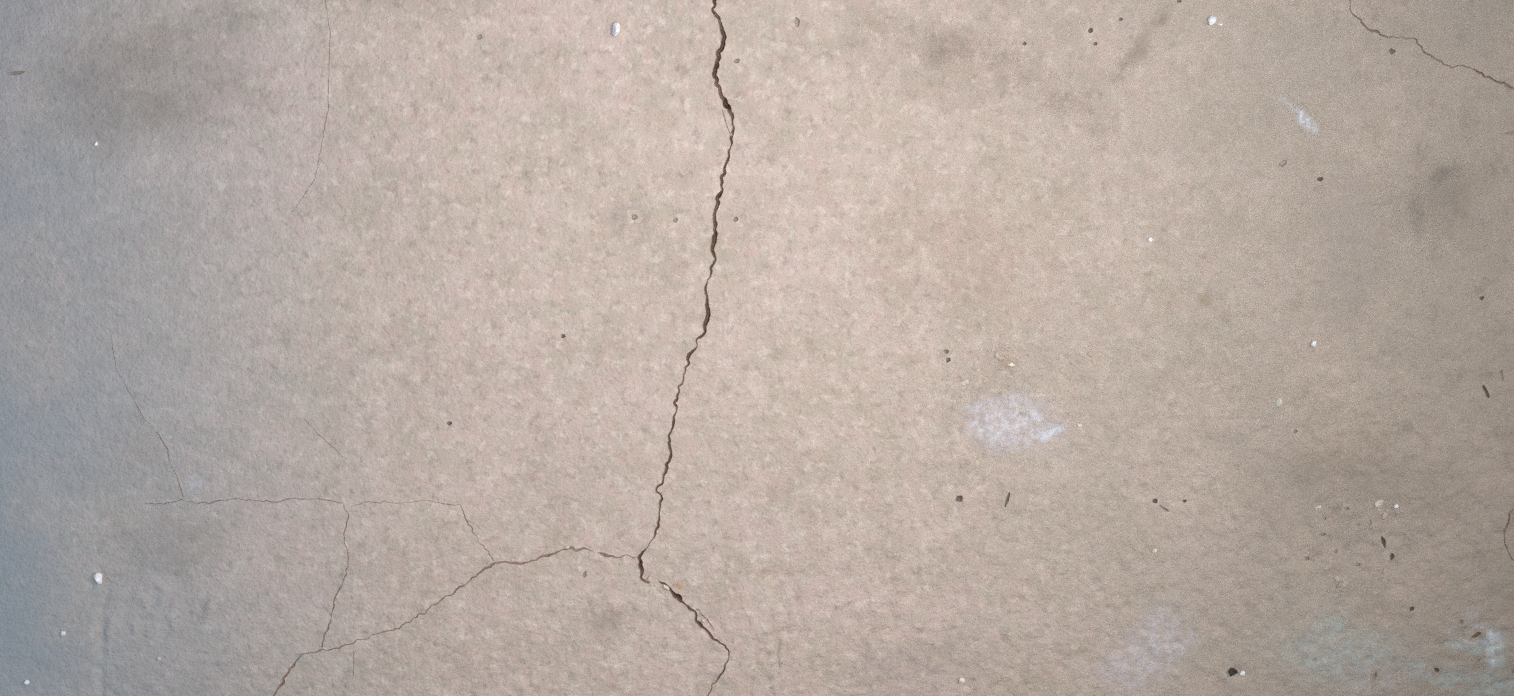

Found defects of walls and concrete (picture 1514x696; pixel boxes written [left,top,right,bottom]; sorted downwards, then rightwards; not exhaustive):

crack [1349,0,1514,90]
crack [111,0,735,696]
crack [1503,508,1514,562]